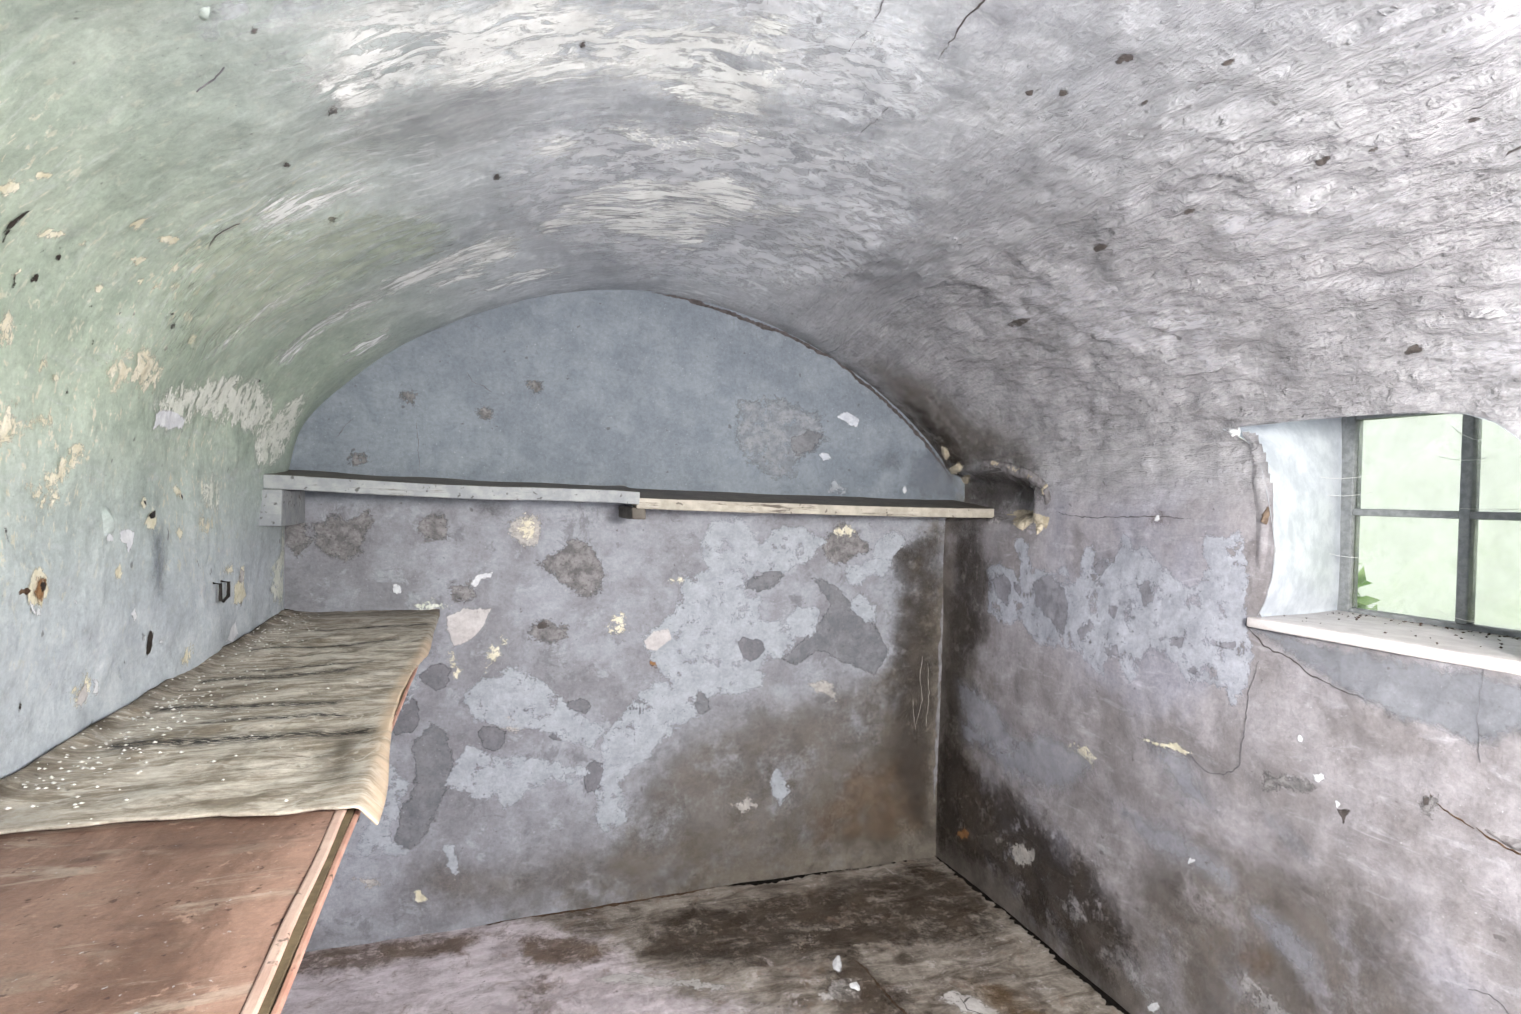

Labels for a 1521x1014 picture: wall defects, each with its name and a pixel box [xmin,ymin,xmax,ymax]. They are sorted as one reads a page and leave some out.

crack [938,0,985,60]
peeling [0,309,14,346]
peeling [357,512,906,857]
leakage [442,535,1130,972]
crack [1430,794,1521,855]
peeling [442,843,462,880]
leakage [647,865,999,1014]